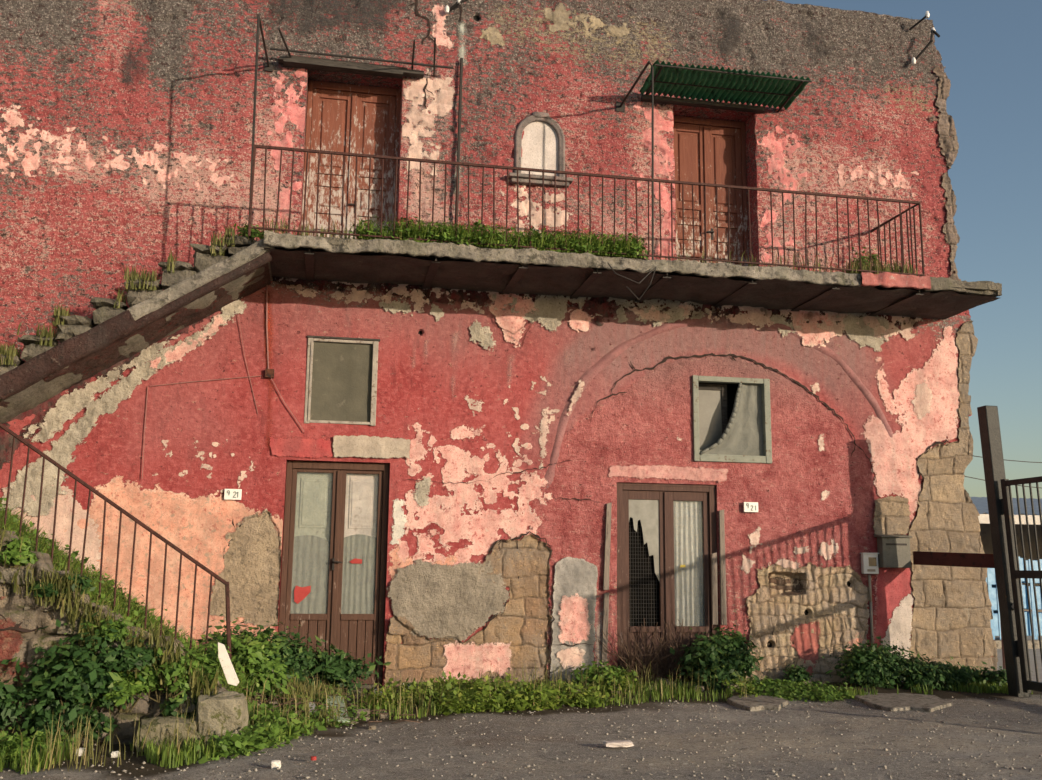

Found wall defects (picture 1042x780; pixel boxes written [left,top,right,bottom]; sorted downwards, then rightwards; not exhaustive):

crack [408,0,437,109]
flaking render [544,2,630,43]
peeling [0,105,237,191]
flaking render [402,69,459,176]
peeling [0,297,283,647]
spalling [272,276,998,689]
crack [590,353,877,482]
peeling [0,617,28,740]